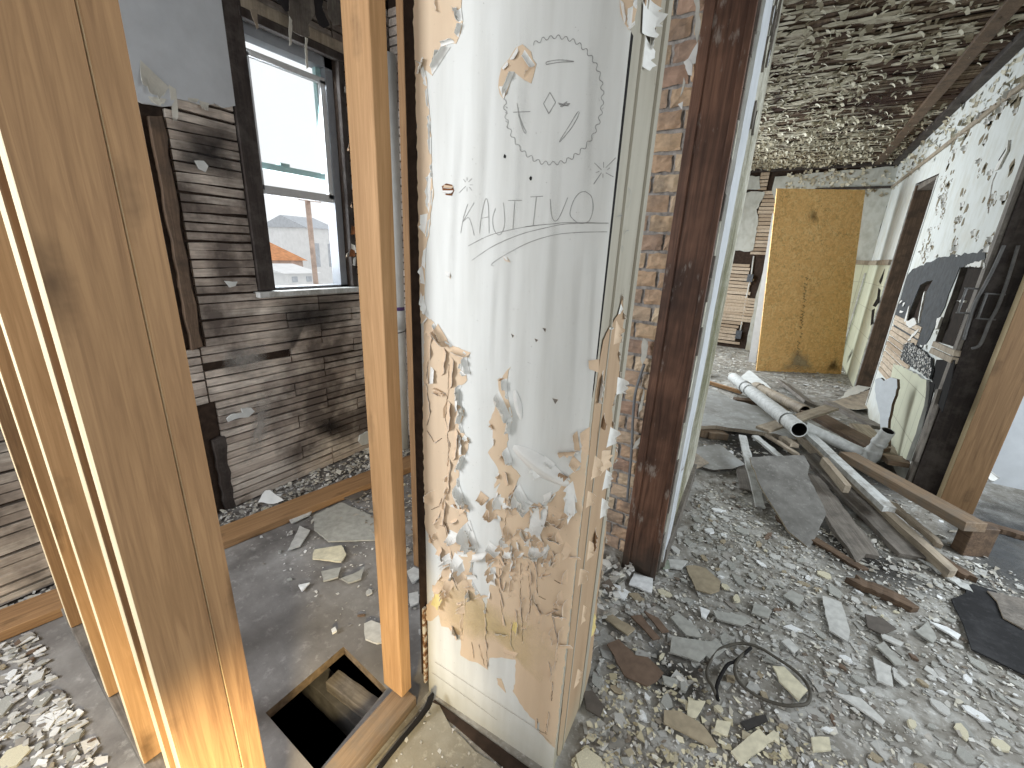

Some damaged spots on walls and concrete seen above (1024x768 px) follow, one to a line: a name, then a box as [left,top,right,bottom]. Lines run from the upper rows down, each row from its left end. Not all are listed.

peeling [407,0,721,756]
peeling [749,0,1024,348]